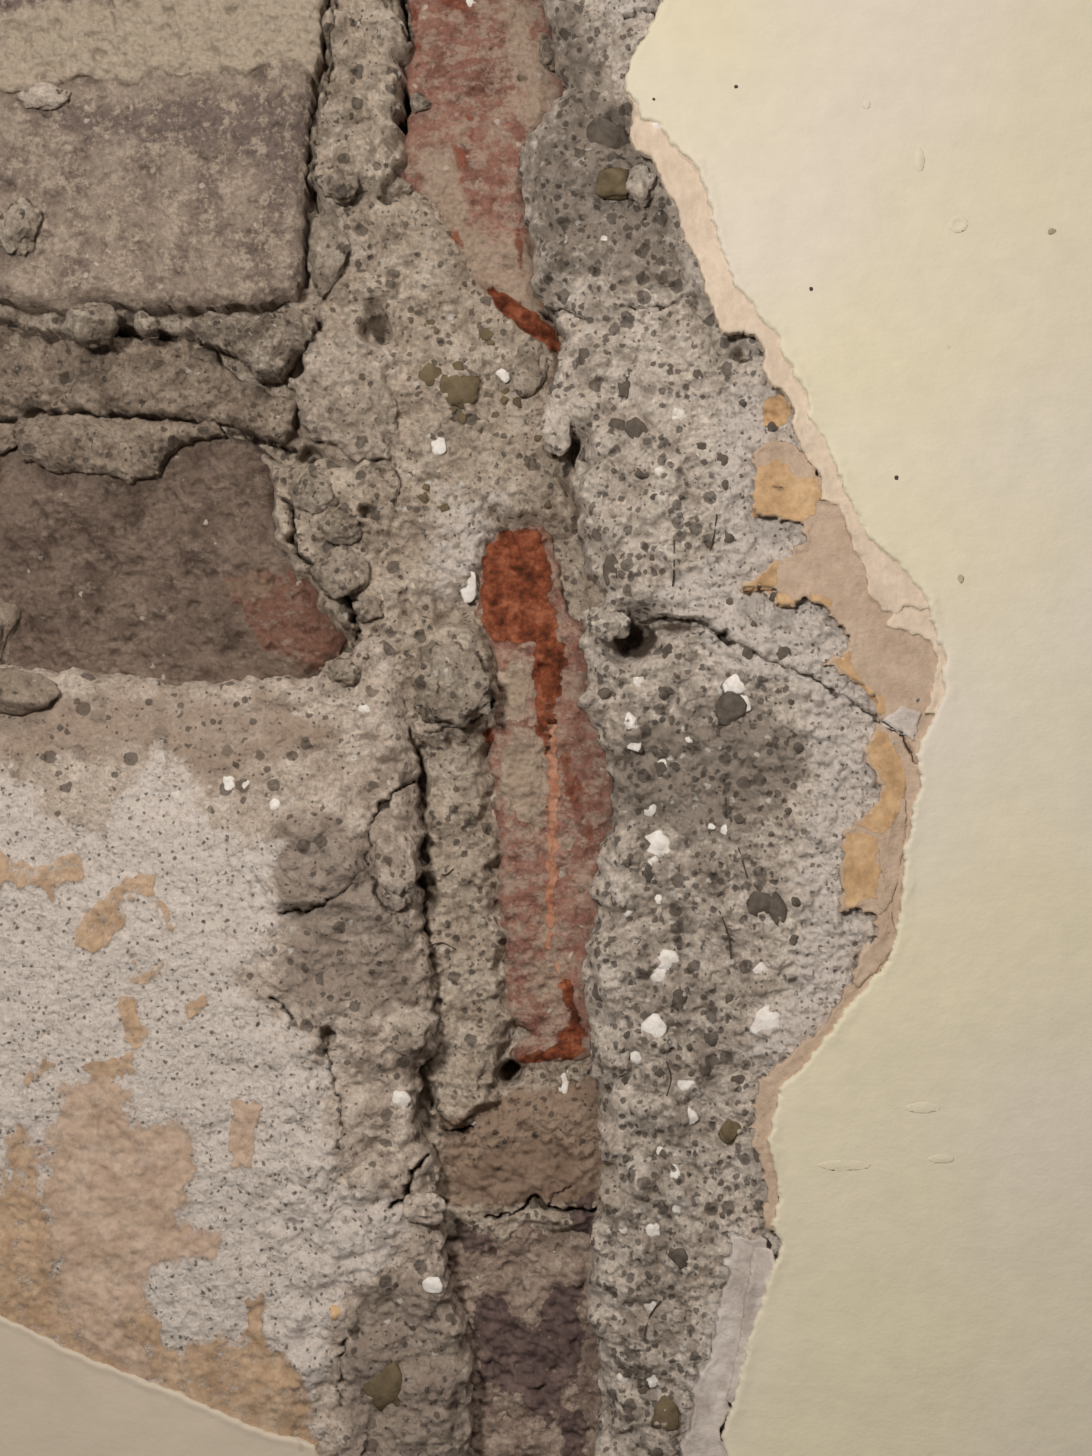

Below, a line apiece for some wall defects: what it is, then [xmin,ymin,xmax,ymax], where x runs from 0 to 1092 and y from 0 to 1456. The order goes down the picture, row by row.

corrosion [442,0,467,16]
corrosion [515,217,523,268]
corrosion [487,287,561,352]
peeling [11,413,227,485]
crack [231,432,298,455]
flaking render [519,0,881,1456]
crack [638,616,913,758]
peeling [497,738,547,828]
corrosion [480,528,587,1063]
flaking render [0,635,475,1456]
crack [390,1125,472,1207]
crack [494,1194,595,1218]